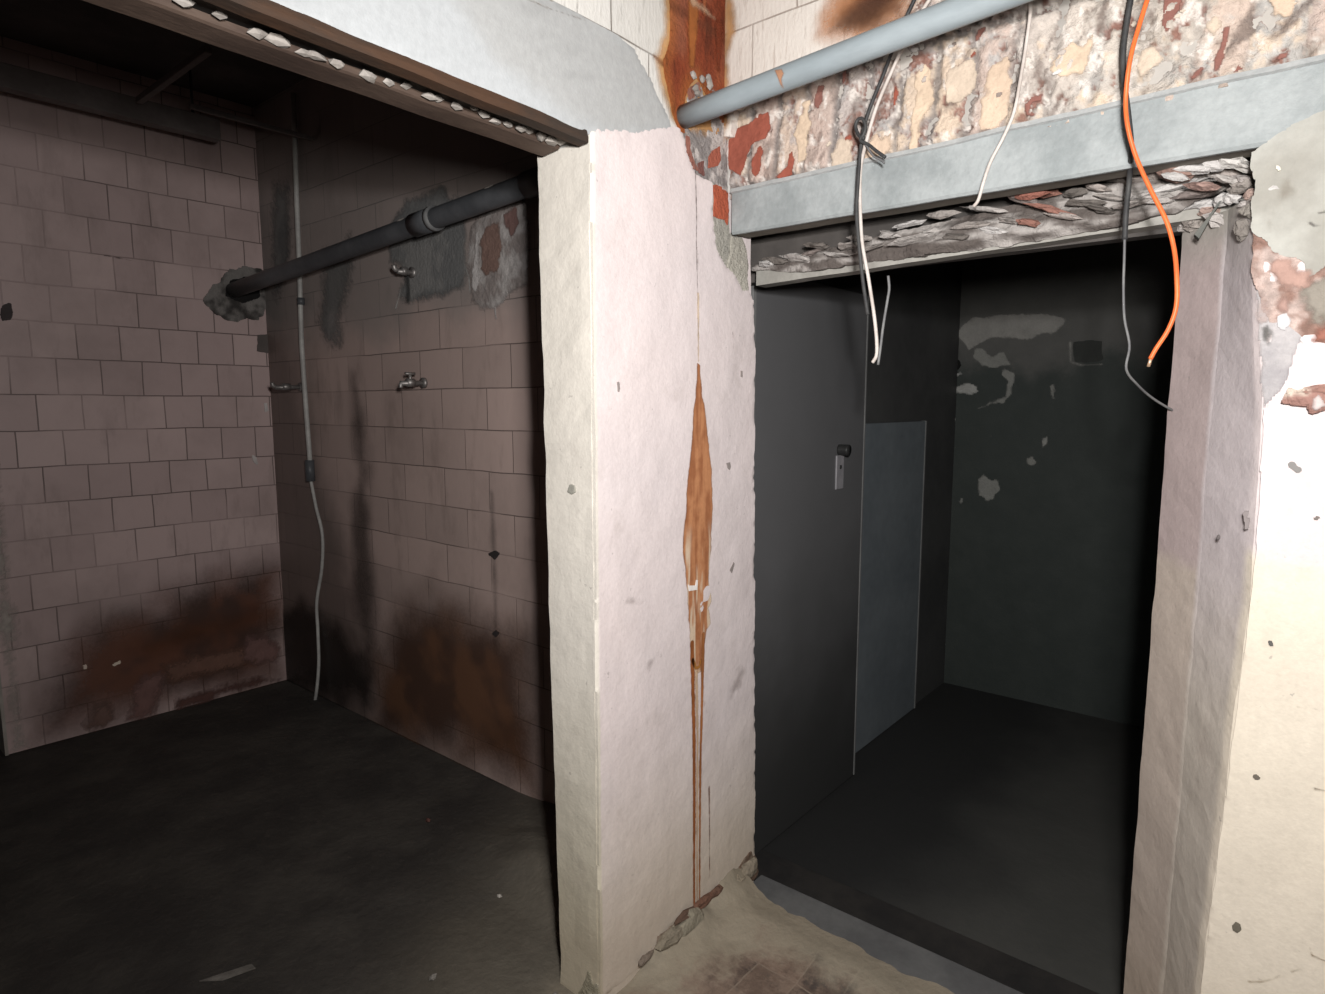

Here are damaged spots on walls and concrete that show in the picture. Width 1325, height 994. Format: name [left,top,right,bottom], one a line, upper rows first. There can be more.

corrosion [658,0,734,135]
corrosion [823,0,906,36]
flaking render [683,0,1325,291]
peeling [464,200,529,318]
leakage [355,496,372,632]
corrosion [683,294,713,906]
leakage [55,573,527,773]